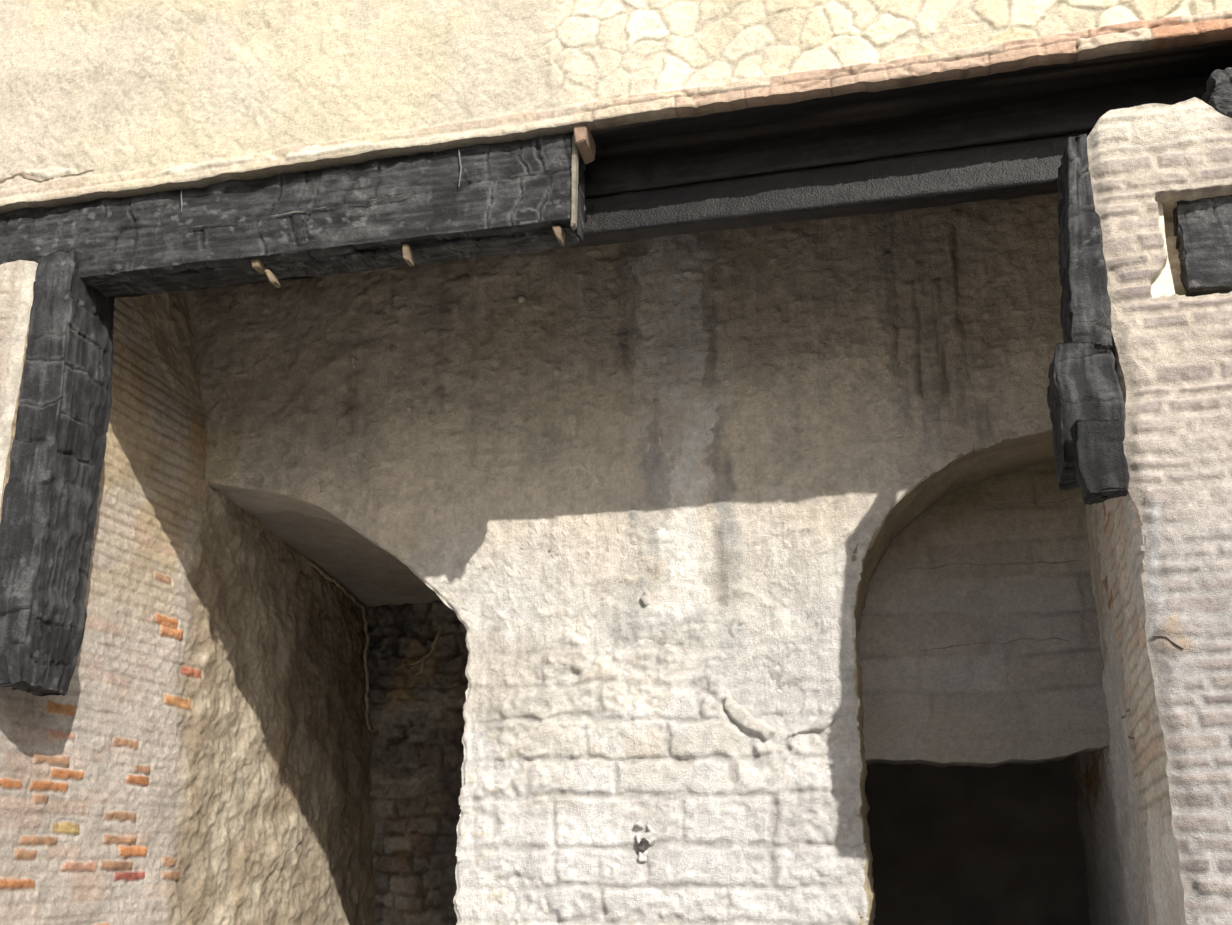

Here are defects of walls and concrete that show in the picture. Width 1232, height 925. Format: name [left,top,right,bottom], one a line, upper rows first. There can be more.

leakage [593,229,768,706]
leakage [868,201,1001,461]